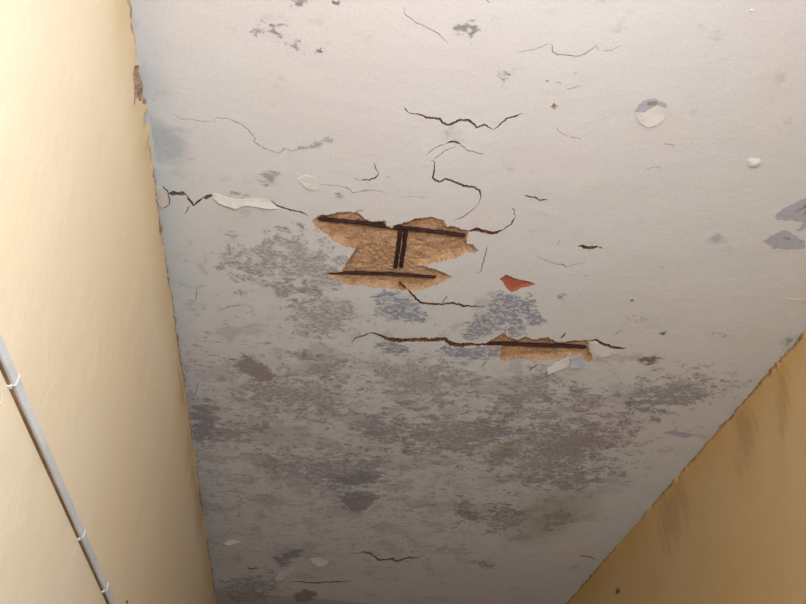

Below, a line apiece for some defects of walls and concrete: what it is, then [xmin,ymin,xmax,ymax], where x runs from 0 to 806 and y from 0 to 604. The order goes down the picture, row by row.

peeling [635,98,667,128]
crack [162,186,212,214]
crack [320,107,546,273]
peeling [763,199,806,250]
damp [216,223,363,343]
spalling [313,211,478,323]
crack [399,282,483,307]
crack [352,332,486,365]
spalling [441,275,616,375]
crack [590,339,626,349]
damp [190,349,737,535]
damp [219,549,316,603]